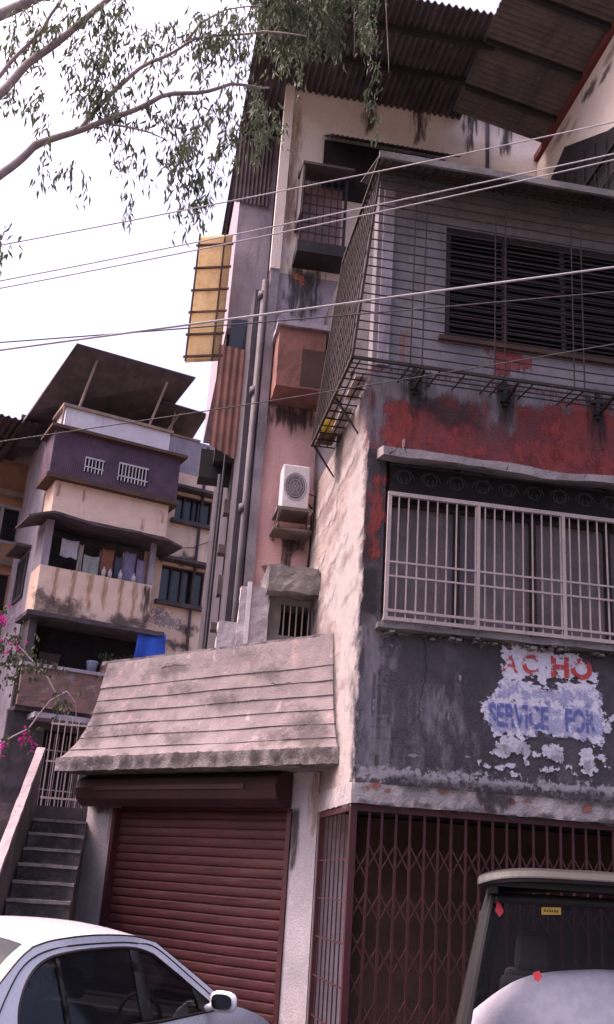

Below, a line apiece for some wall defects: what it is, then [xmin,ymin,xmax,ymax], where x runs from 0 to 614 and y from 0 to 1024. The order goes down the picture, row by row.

damp [363,104,377,133]
damp [413,110,427,143]
damp [463,116,477,151]
damp [498,129,512,154]
damp [283,267,321,318]
damp [268,405,313,434]
peeling [512,414,614,476]
damp [281,528,304,567]
damp [33,589,87,619]
damp [111,586,152,629]
damp [350,532,614,811]